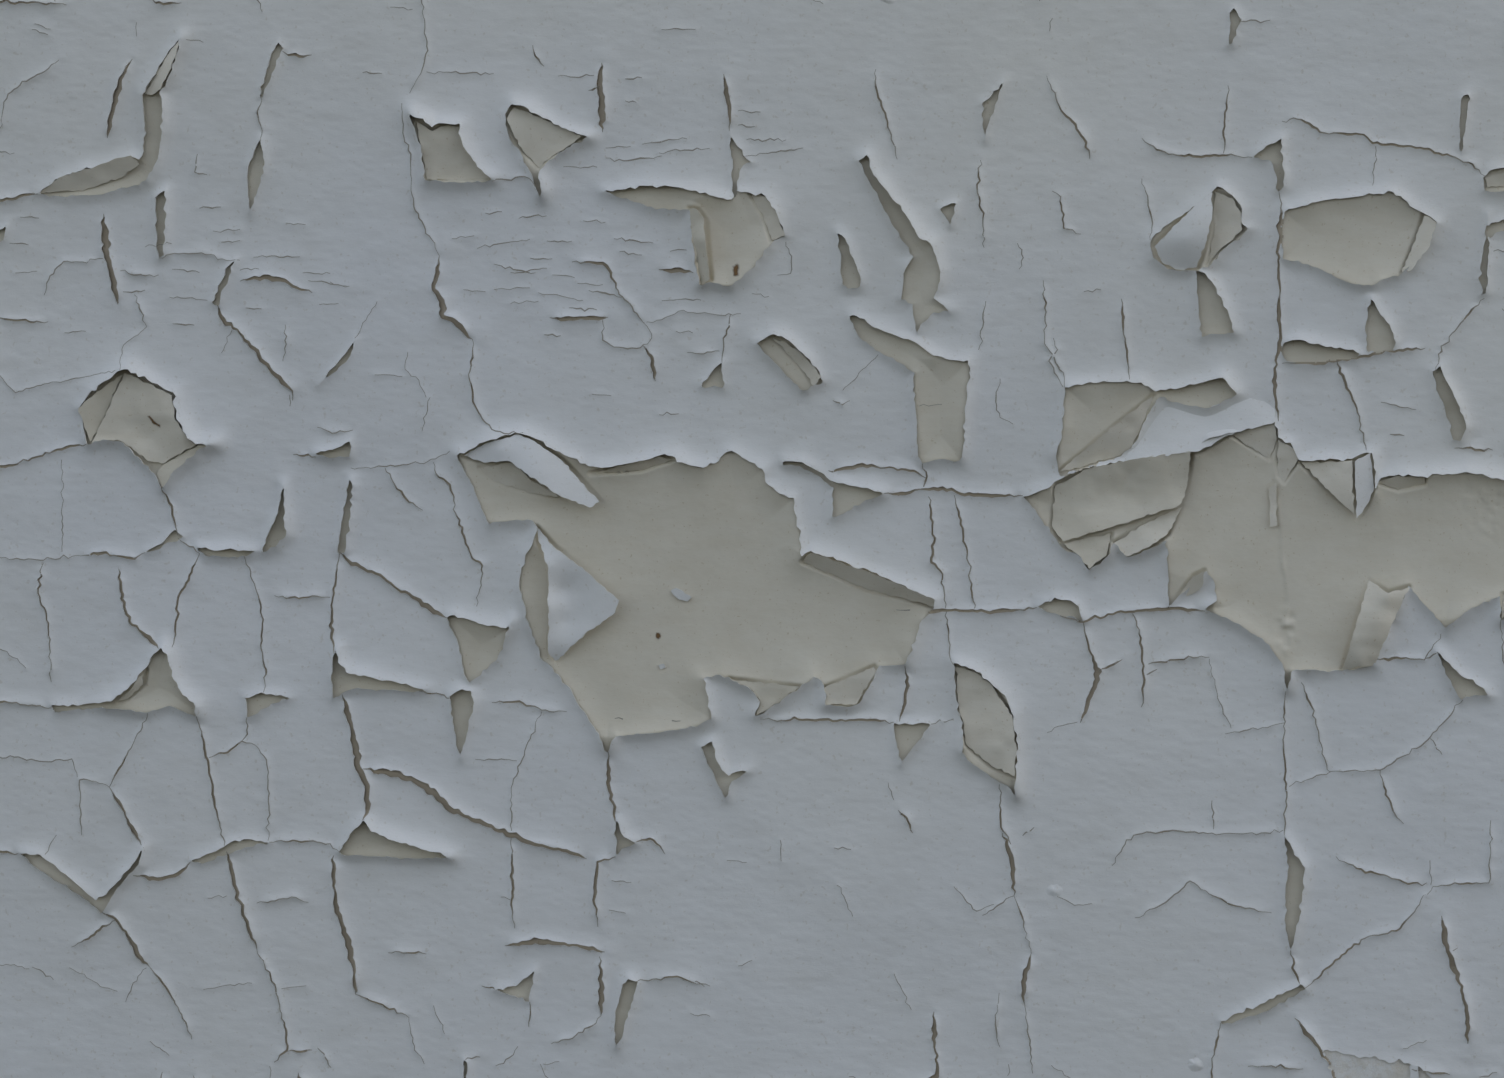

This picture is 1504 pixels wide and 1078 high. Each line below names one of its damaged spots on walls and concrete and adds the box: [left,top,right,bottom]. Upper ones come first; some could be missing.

peeling [78,369,206,488]
crack [0,154,377,458]
crack [0,352,709,1078]
crack [363,0,802,434]
peeling [606,138,785,286]
peeling [458,433,935,752]
peeling [850,155,970,463]
peeling [1024,367,1504,688]
peeling [1282,191,1437,363]
crack [1272,193,1503,448]
crack [954,784,1070,1078]
crack [1211,820,1497,1078]